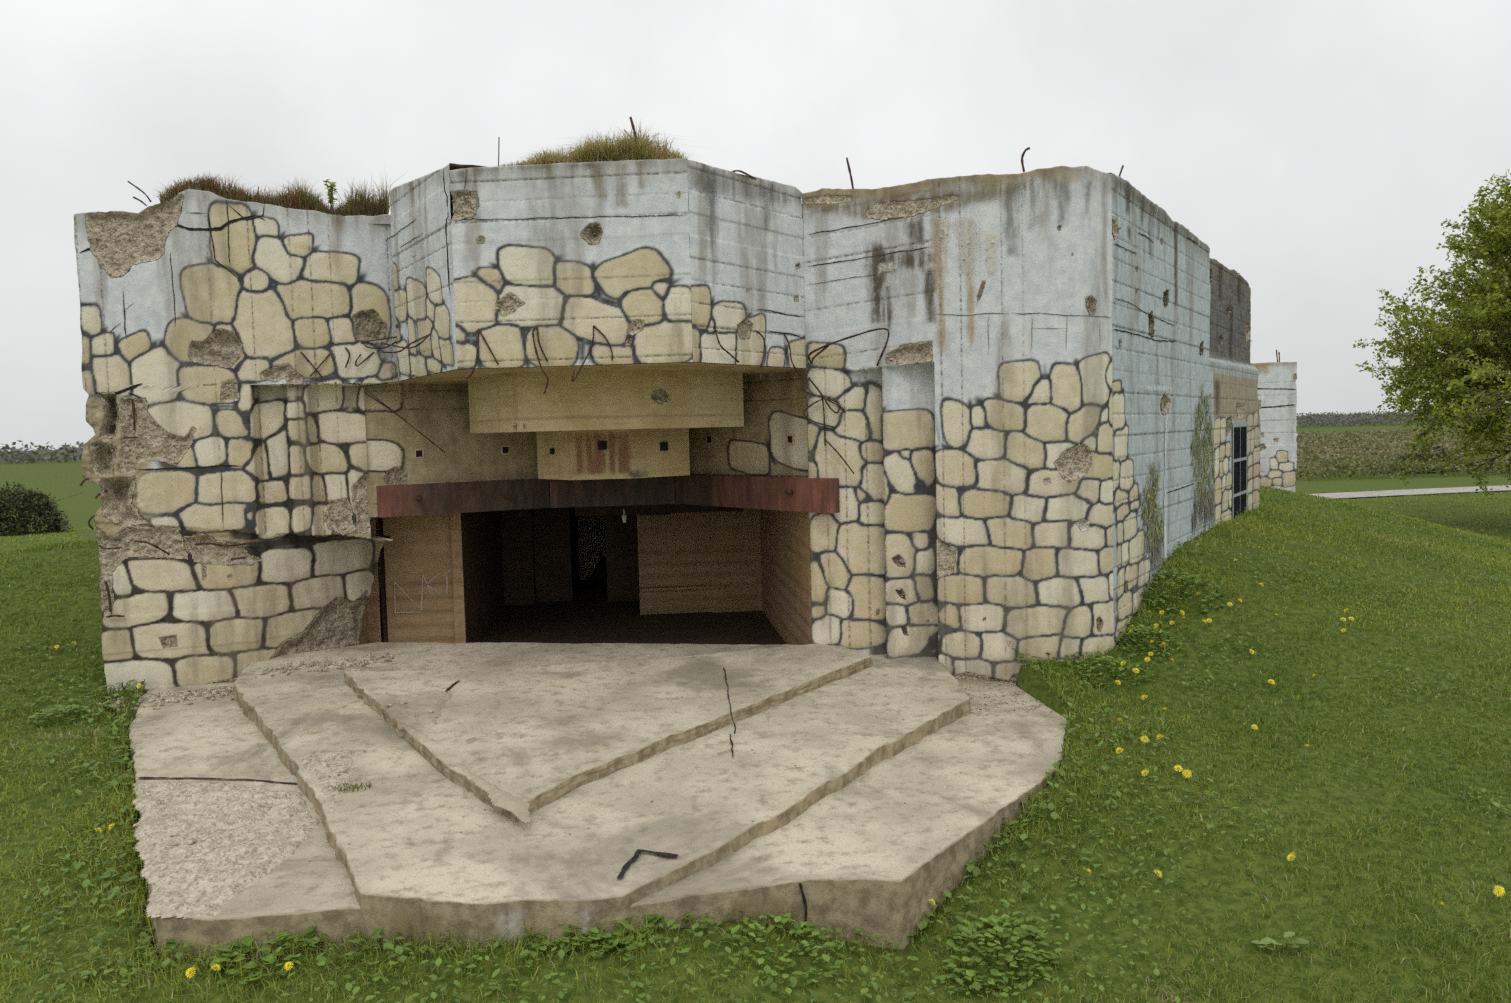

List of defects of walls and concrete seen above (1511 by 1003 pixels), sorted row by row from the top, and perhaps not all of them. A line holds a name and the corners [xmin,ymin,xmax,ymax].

spalling [85,194,184,278]
water stain [872,182,1024,327]
spalling [188,329,243,403]
spalling [260,364,303,388]
spalling [885,341,933,365]
spalling [1043,444,1094,485]
spalling [91,393,261,619]